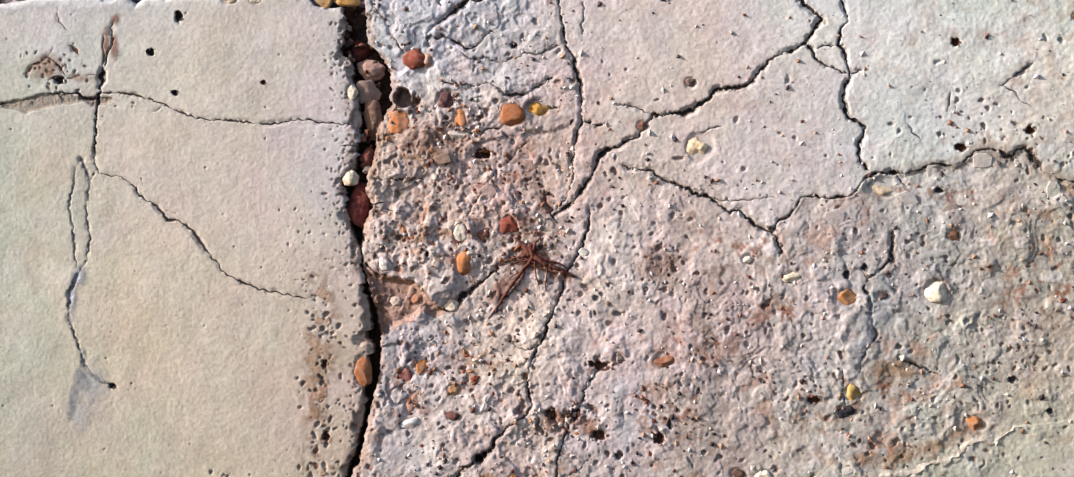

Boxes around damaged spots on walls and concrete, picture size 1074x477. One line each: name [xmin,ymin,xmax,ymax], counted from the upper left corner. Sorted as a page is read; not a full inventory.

spalling [2,94,114,113]
crack [25,0,427,477]
crack [411,0,1074,477]